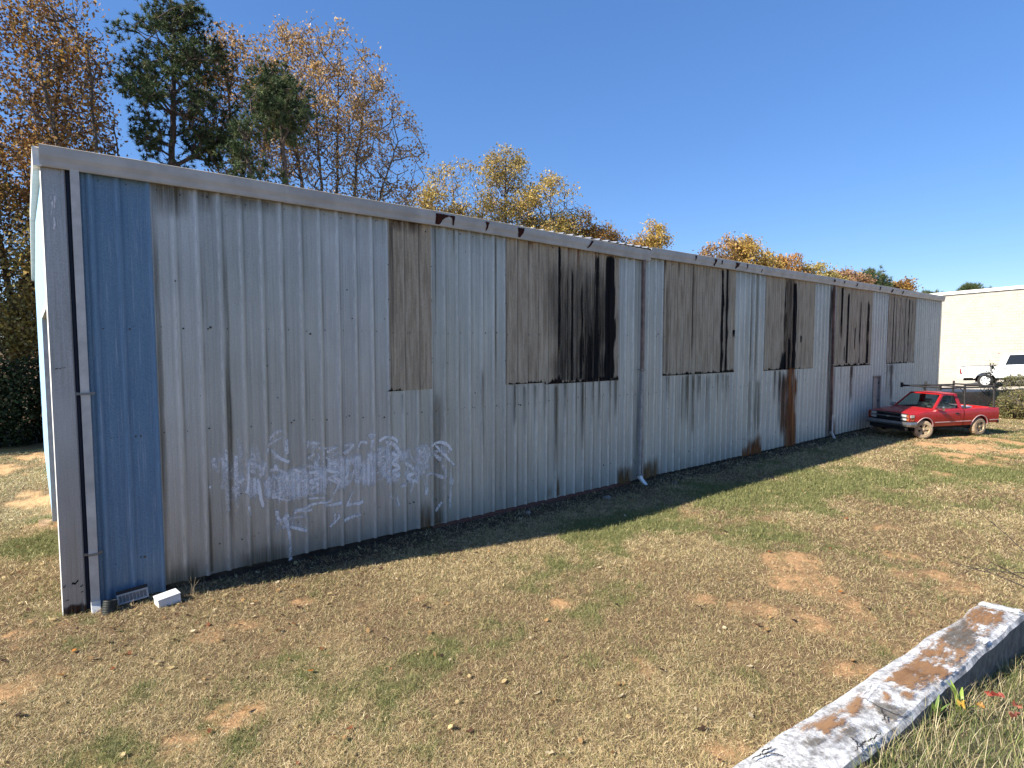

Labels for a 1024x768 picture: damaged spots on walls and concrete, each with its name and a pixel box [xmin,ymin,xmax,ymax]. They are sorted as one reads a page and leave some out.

corrosion [435,213,455,226]
water stain [509,247,618,384]
water stain [663,269,735,376]
water stain [764,283,805,371]
corrosion [774,282,798,447]
water stain [834,287,871,367]
corrosion [742,395,761,457]